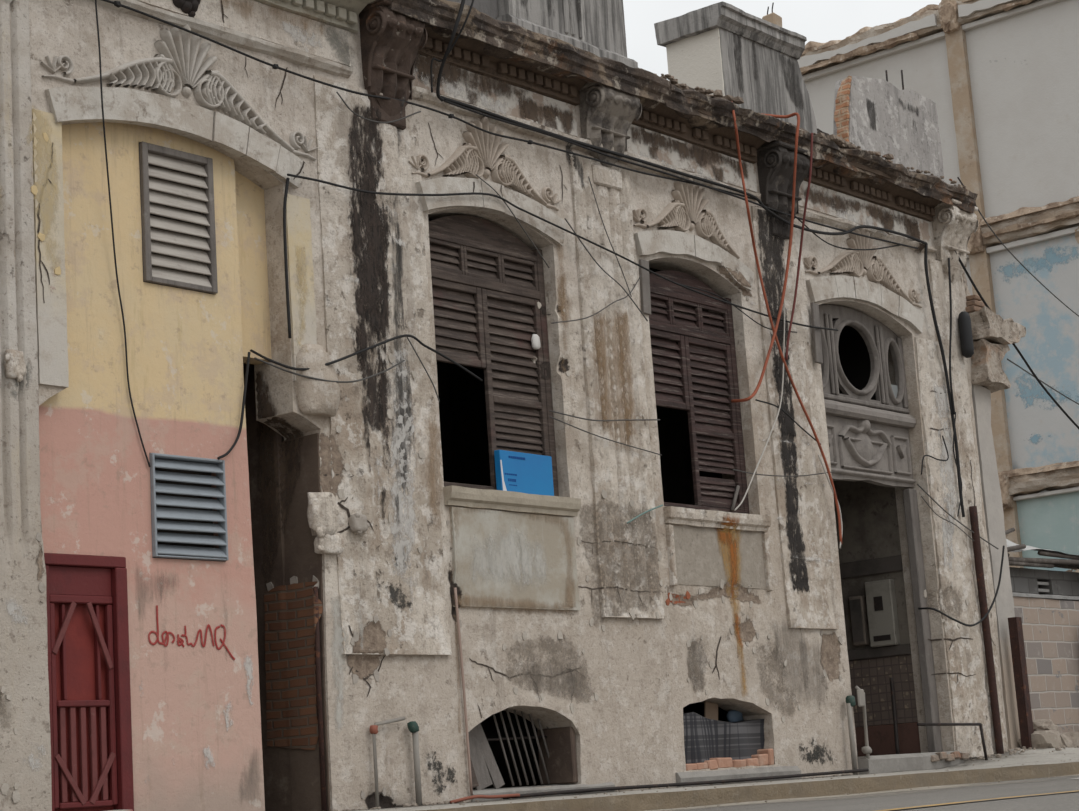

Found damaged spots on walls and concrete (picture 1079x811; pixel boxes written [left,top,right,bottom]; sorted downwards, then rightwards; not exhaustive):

water stain [327,29,351,66]
water stain [415,49,584,187]
water stain [632,127,748,183]
water stain [733,31,757,91]
water stain [780,55,804,109]
water stain [867,99,876,130]
water stain [348,106,413,524]
water stain [755,206,833,593]
spalling [577,489,801,723]
corrosion [717,516,746,691]
spalling [347,615,392,684]
spalling [502,630,599,713]